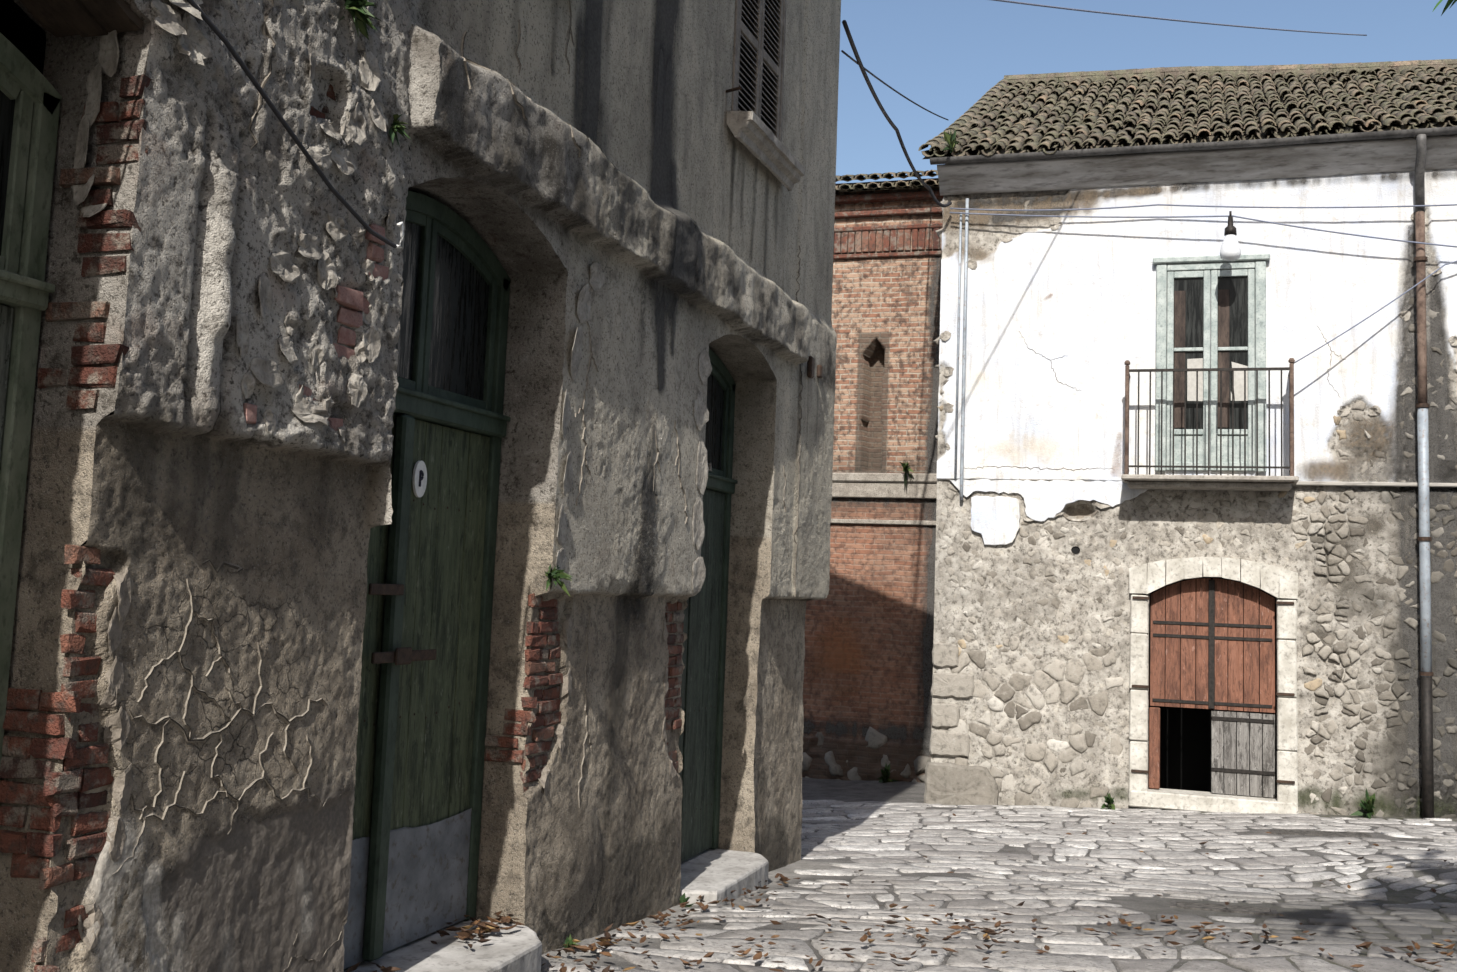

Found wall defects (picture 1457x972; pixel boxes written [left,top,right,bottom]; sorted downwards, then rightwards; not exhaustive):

flaking render [59,30,152,277]
water stain [575,0,603,145]
water stain [643,0,704,392]
flaking render [37,301,129,410]
peeling [236,209,395,443]
peeling [662,350,712,779]
peeling [950,479,1148,545]
water stain [1308,225,1457,819]
flaking render [0,545,134,890]
crack [112,579,341,875]
flaking render [484,593,573,794]
water stain [89,827,180,972]